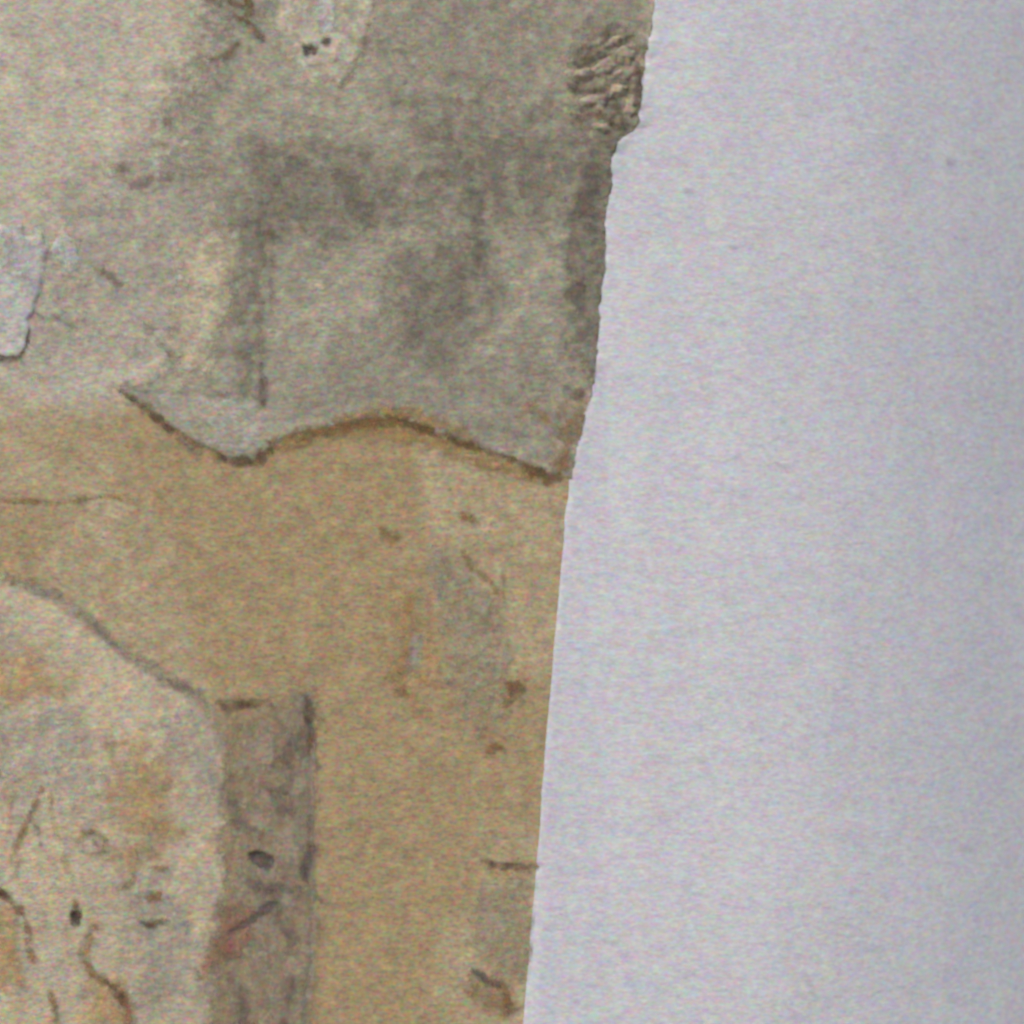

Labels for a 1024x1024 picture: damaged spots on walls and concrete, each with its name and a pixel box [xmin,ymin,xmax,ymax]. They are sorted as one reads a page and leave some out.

water stain [244,150,387,252]
peeling [0,0,655,479]
water stain [396,236,495,362]
water stain [416,121,615,375]